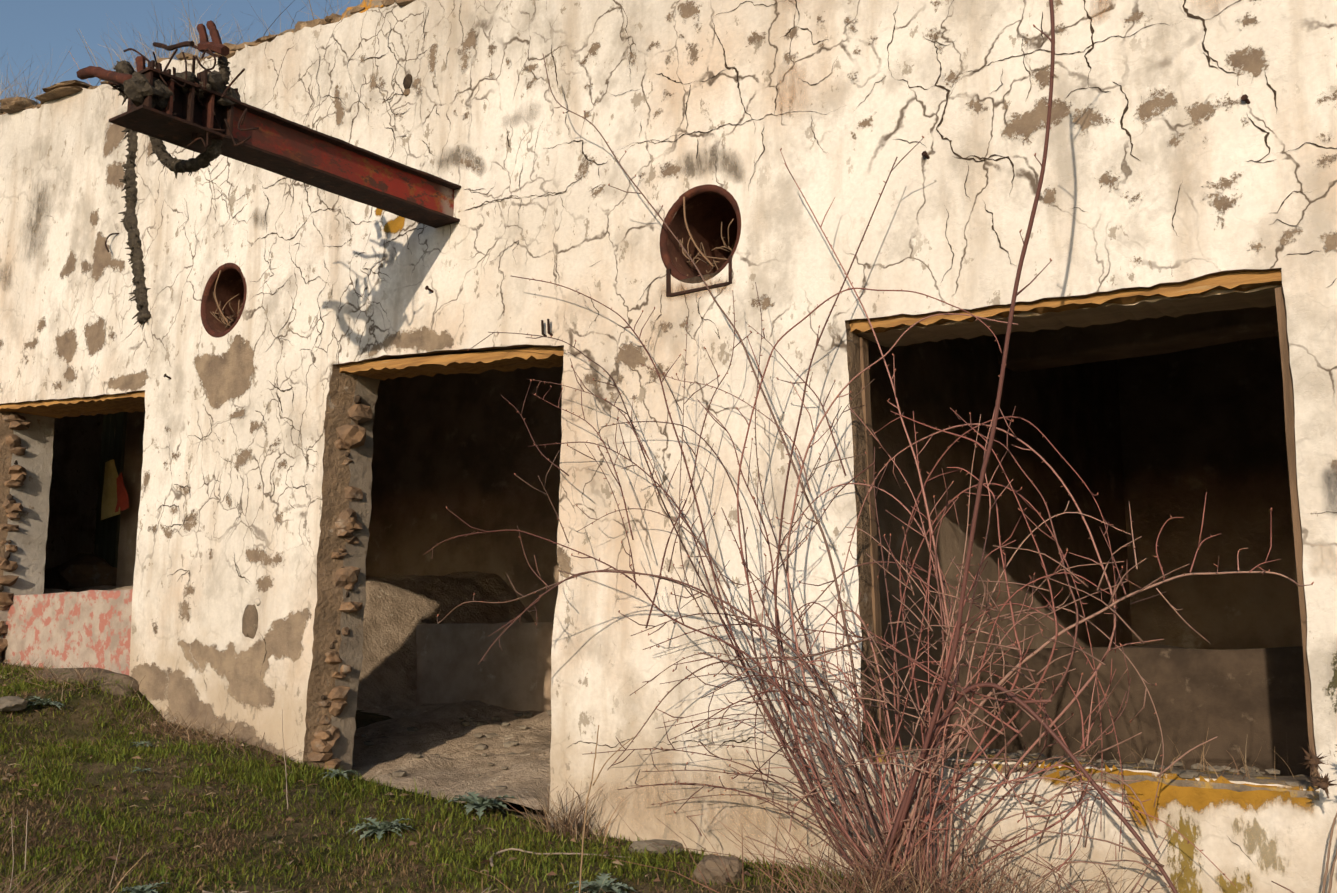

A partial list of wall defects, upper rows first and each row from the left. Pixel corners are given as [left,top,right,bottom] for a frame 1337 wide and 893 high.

crack [316,6,463,154]
crack [464,0,1337,285]
crack [159,158,427,532]
crack [696,286,720,339]
flaking render [0,315,149,662]
flaking render [130,325,564,771]
damp [1325,653,1337,714]